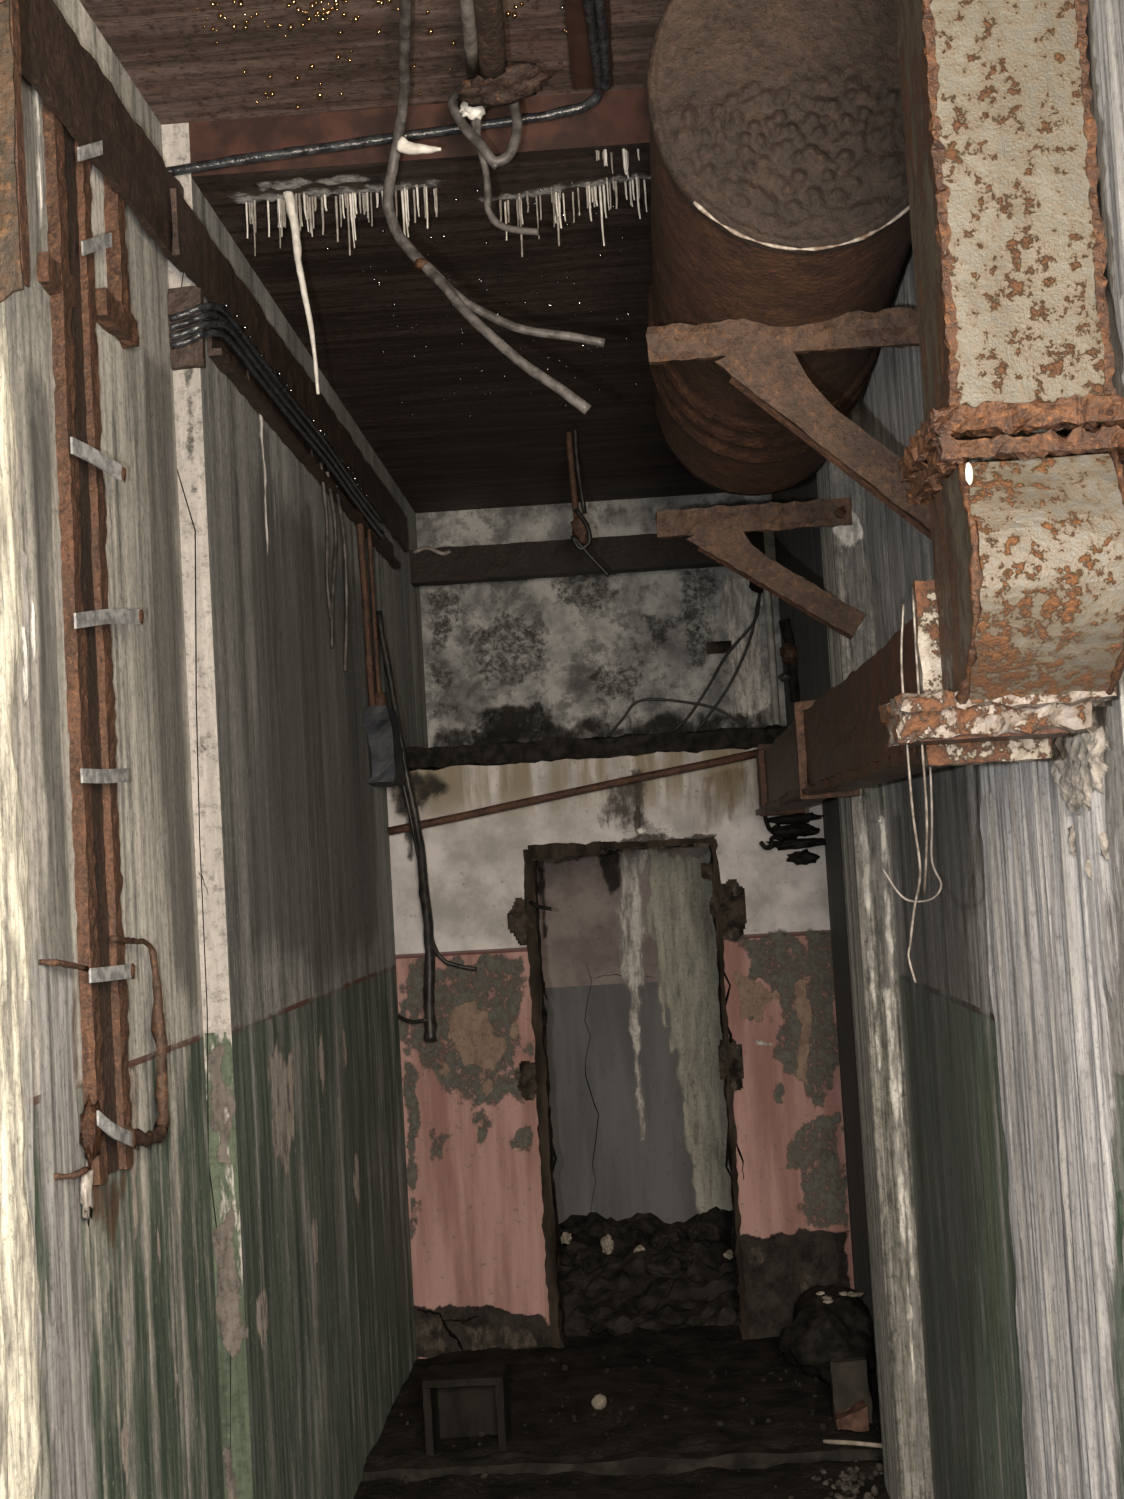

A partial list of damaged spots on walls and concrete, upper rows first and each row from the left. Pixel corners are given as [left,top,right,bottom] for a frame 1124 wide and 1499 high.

damp [233,176,436,204]
damp [480,175,651,202]
damp [428,587,464,715]
damp [469,610,545,684]
damp [472,702,552,745]
damp [551,574,618,609]
damp [590,568,771,728]
corrosion [755,579,1052,816]
damp [604,770,645,831]
peeling [399,898,537,1240]
damp [615,848,733,1214]
peeling [533,828,851,1339]